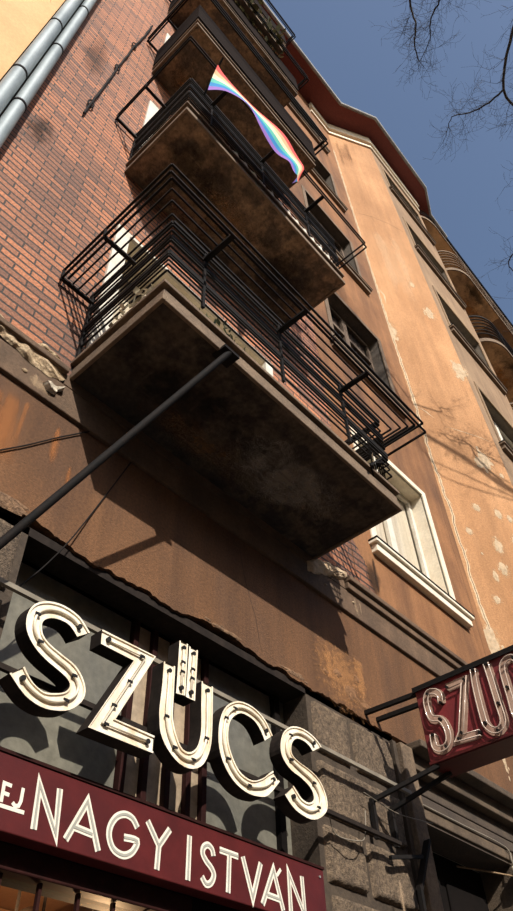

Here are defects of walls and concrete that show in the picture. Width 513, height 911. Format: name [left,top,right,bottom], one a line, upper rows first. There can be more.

spalling [0,314,66,395]
crack [333,150,492,655]
spalling [474,446,504,479]
spalling [307,540,376,594]
spalling [493,536,513,582]